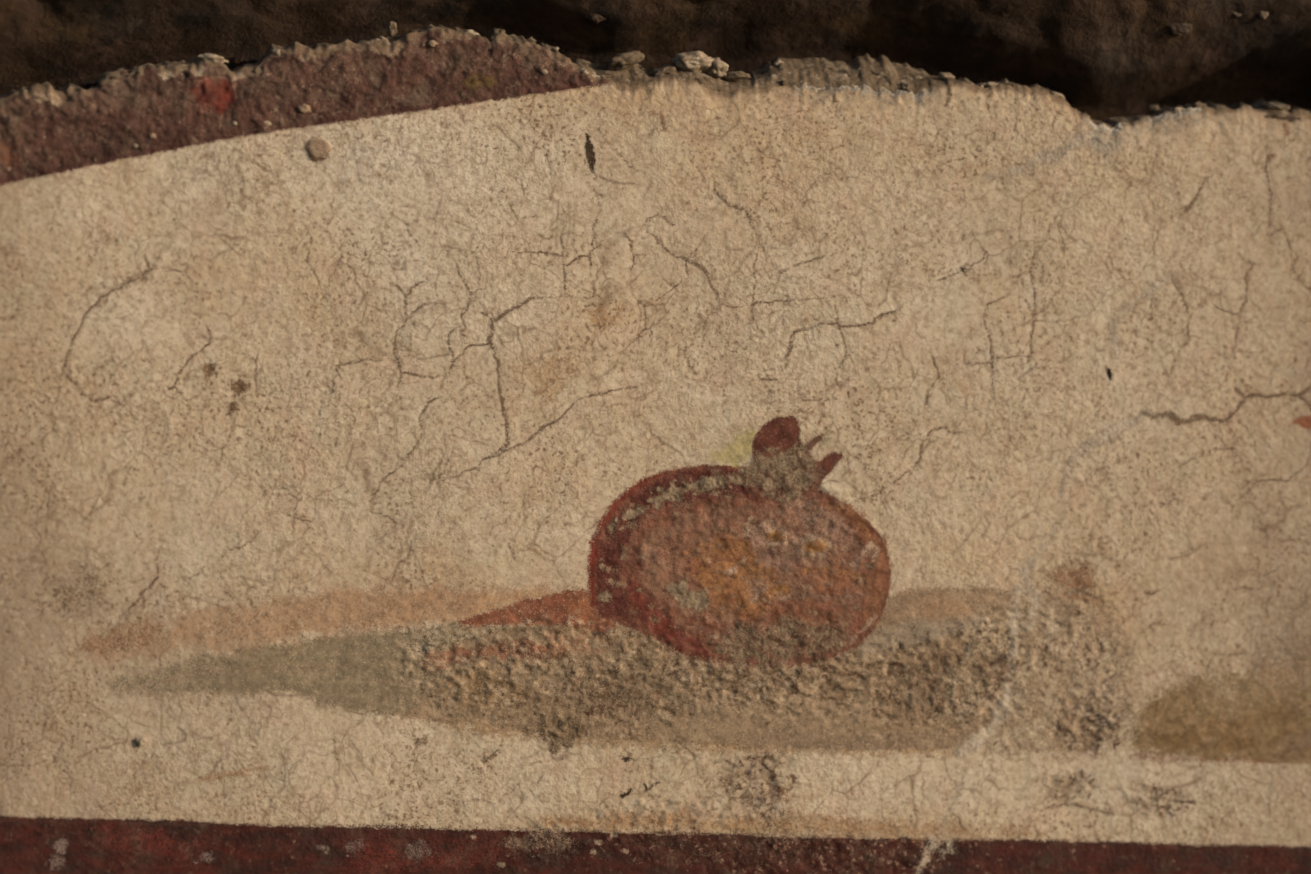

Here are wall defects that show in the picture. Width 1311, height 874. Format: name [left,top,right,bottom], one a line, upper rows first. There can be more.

spalling [0,21,1311,128]
spalling [585,132,596,176]
crack [979,124,1126,196]
crack [1178,176,1209,218]
crack [1265,136,1311,323]
crack [52,243,184,424]
crack [163,325,212,401]
crack [255,176,1060,534]
crack [117,550,204,623]
crack [916,261,1311,874]
crack [731,762,767,801]